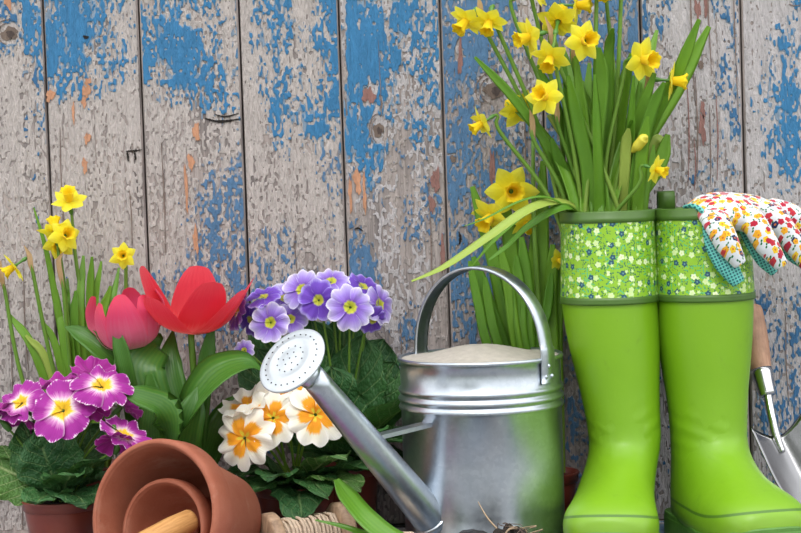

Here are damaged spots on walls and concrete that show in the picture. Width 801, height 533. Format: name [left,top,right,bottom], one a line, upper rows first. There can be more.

peeling [0,0,801,403]
peeling [0,416,18,446]
peeling [0,500,28,530]
peeling [266,442,305,468]
peeling [563,322,589,494]
peeling [655,363,671,533]
peeling [747,259,801,486]